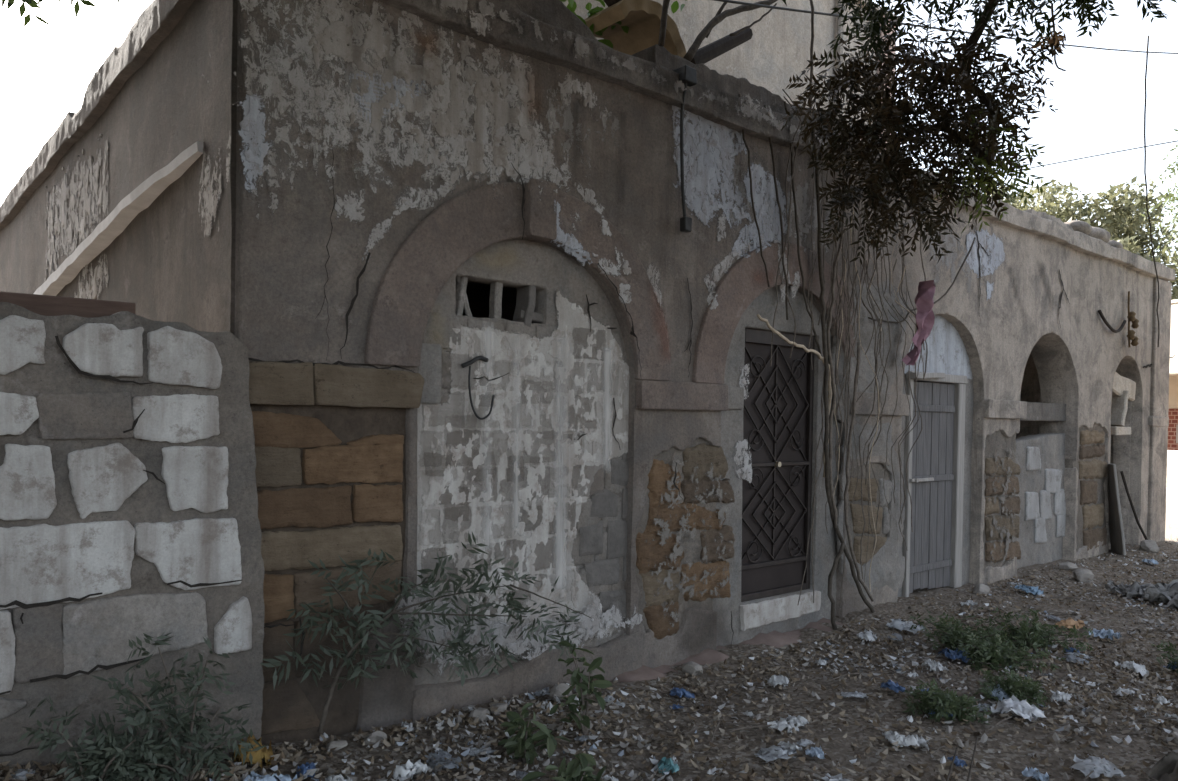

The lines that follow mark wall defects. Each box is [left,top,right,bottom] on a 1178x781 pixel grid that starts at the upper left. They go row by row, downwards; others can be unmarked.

peeling [44,134,110,281]
peeling [74,253,109,300]
peeling [197,94,274,238]
crack [248,150,415,373]
peeling [268,0,632,304]
peeling [647,263,663,307]
peeling [671,105,800,310]
peeling [966,228,1005,300]
peeling [249,290,752,735]